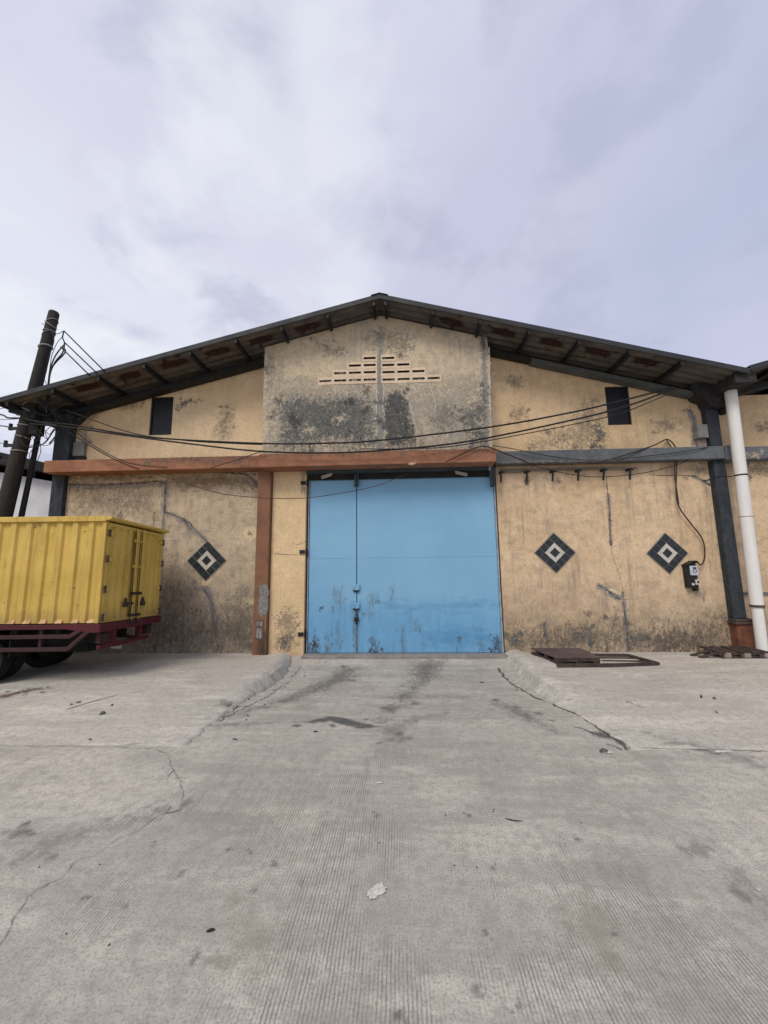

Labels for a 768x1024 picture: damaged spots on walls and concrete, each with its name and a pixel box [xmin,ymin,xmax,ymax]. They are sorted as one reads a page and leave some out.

corrosion [577,347,660,373]
leakage [267,386,416,452]
leakage [450,383,490,449]
crack [597,477,663,651]
leakage [148,561,298,688]
leakage [504,613,730,691]